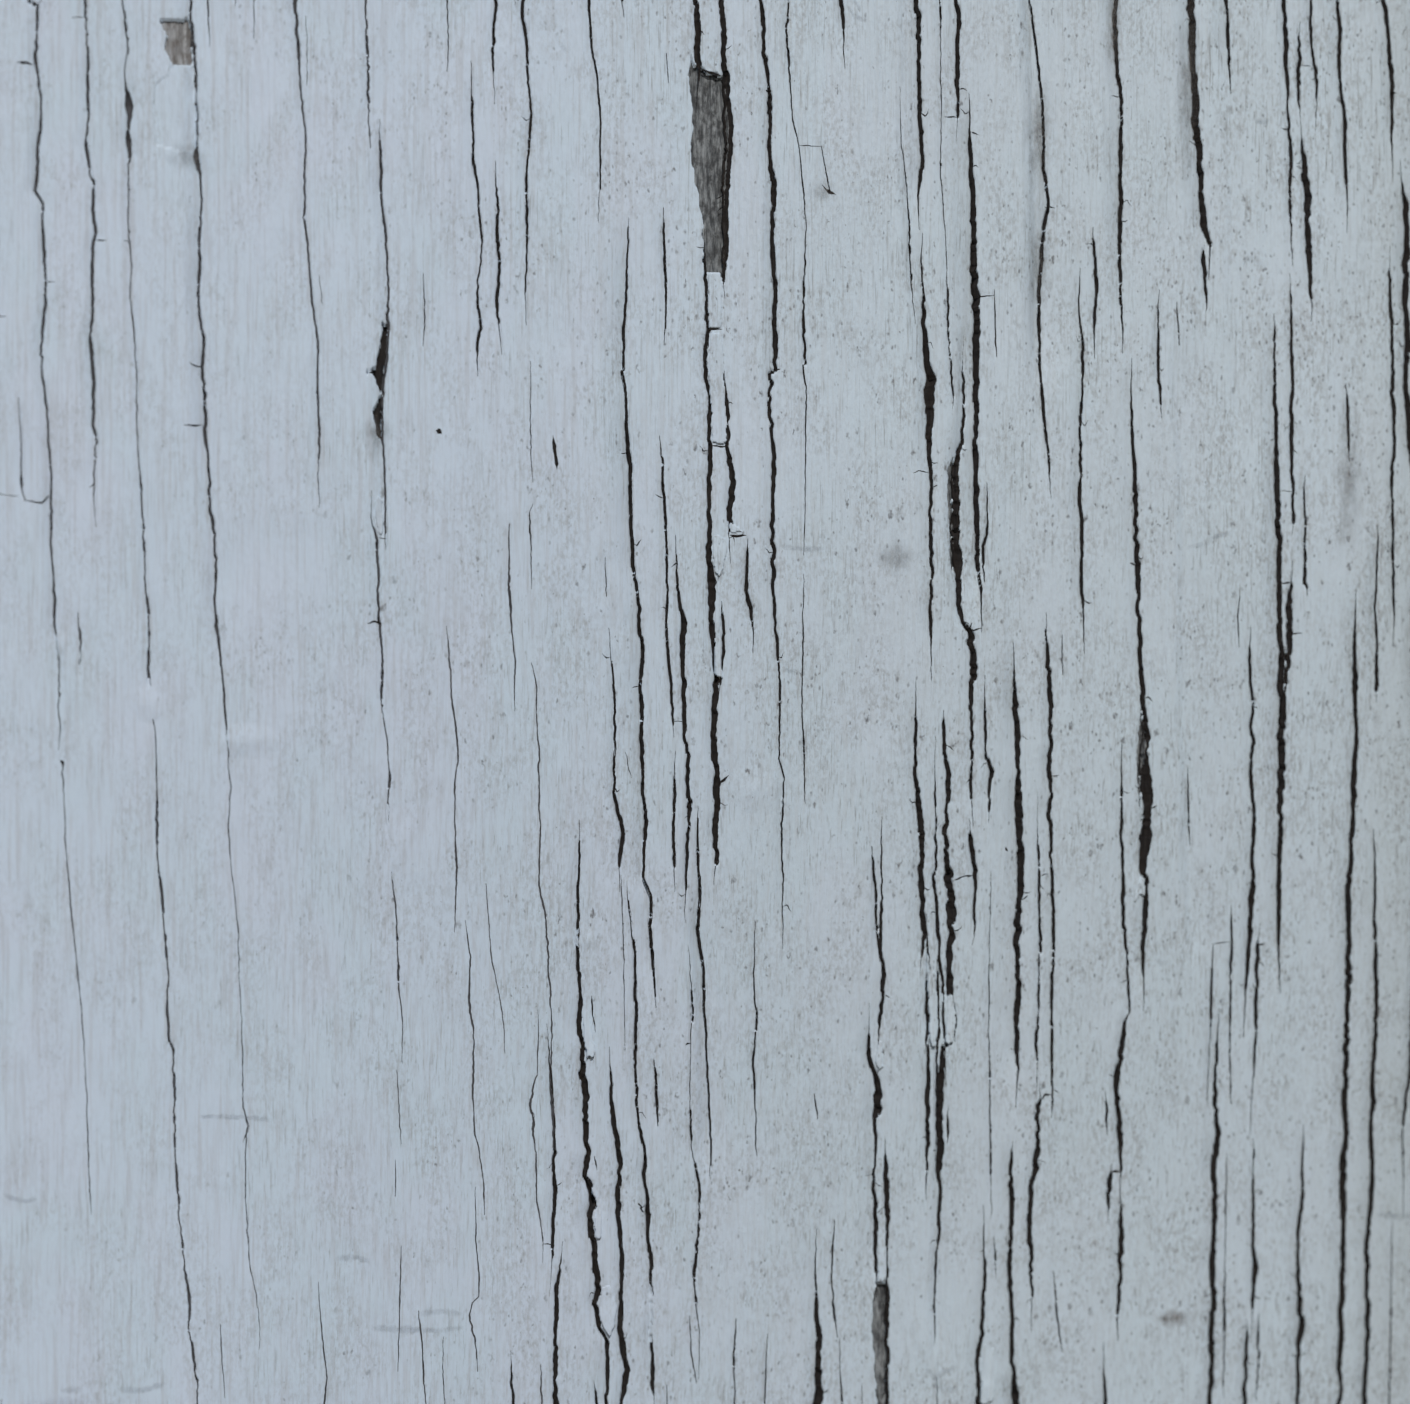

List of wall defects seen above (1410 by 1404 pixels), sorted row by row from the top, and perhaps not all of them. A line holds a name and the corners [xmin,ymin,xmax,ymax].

crack [1,0,225,1404]
peeling [153,20,198,151]
crack [187,0,260,1348]
crack [293,0,324,506]
crack [318,1282,328,1404]
crack [364,0,426,820]
crack [391,872,403,1197]
crack [397,0,831,1404]
peeling [689,63,729,277]
peeling [871,1284,887,1404]
crack [813,0,1231,1404]
crack [1204,0,1410,1404]